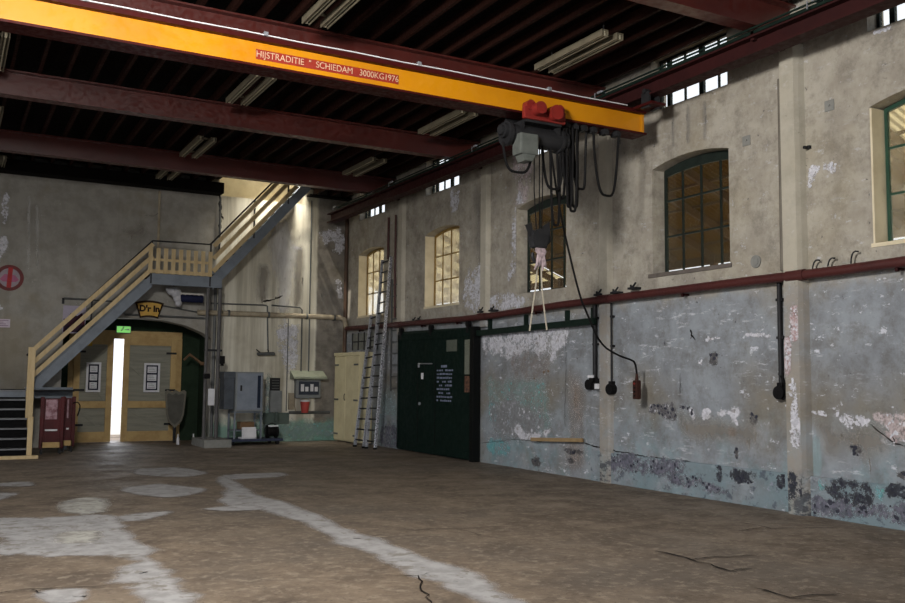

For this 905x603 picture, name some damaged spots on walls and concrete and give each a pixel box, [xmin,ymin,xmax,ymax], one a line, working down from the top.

peeling [0,236,9,261]
peeling [482,327,570,363]
peeling [784,303,800,449]
peeling [649,402,758,426]
peeling [811,409,905,448]